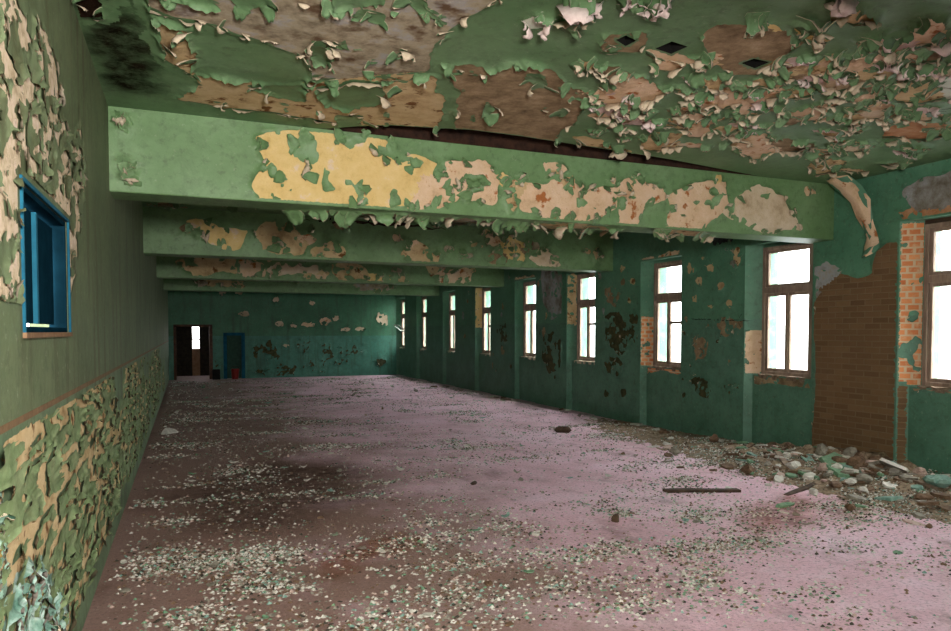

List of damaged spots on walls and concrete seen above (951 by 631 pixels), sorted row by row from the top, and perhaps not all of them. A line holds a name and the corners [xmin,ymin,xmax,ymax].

peeling [0,0,88,304]
water stain [79,0,155,92]
peeling [71,0,951,463]
crack [319,125,755,176]
peeling [0,348,165,631]